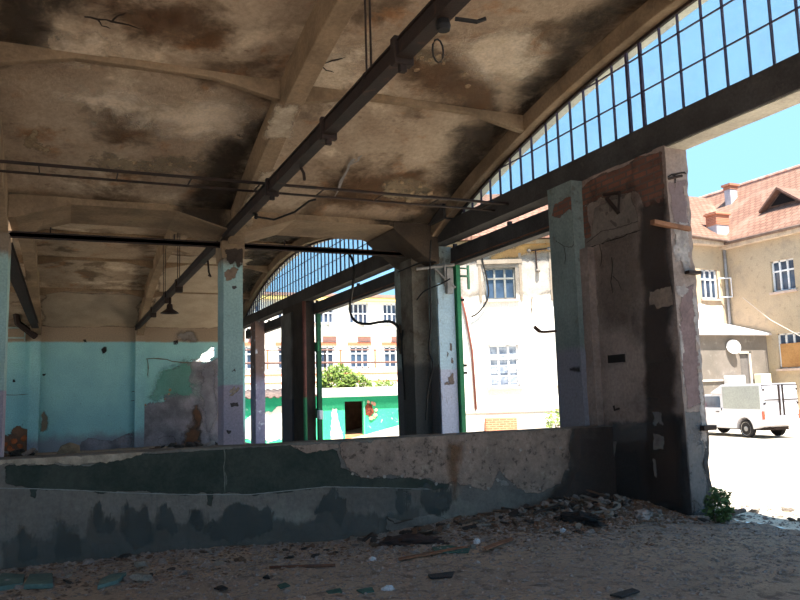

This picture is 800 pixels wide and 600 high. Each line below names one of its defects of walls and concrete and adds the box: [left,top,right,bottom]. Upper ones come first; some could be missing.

crack [84,13,142,30]
water stain [93,0,228,48]
water stain [70,90,249,144]
water stain [246,171,273,203]
flaking render [552,197,572,218]
flaking render [582,152,664,238]
spalling [224,248,243,289]
peeling [0,358,573,506]
water stain [2,482,453,569]